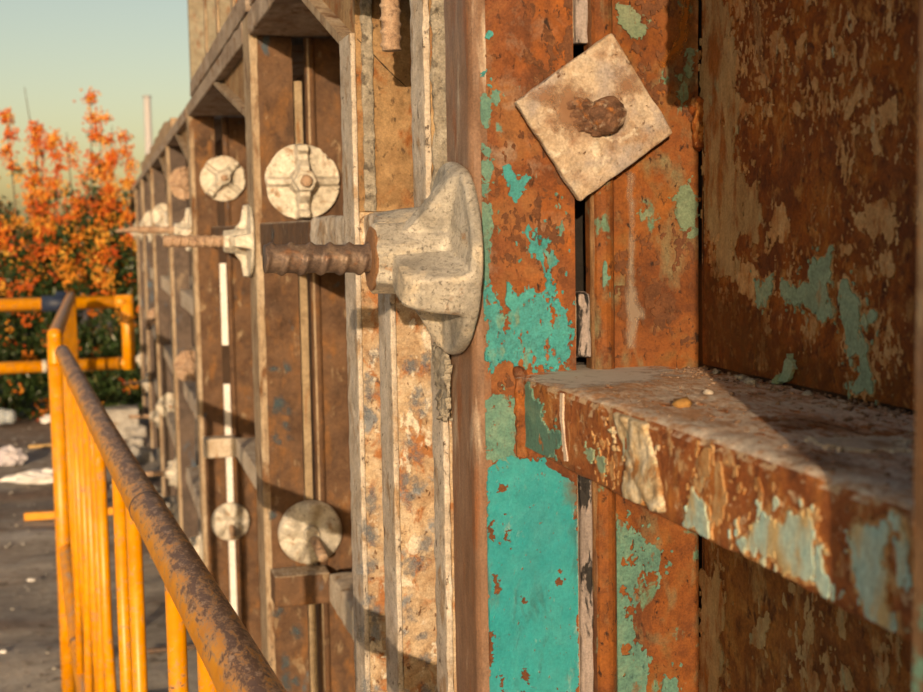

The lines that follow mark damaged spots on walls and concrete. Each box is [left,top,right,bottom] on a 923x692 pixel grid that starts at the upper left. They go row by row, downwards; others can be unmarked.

peeling [480,68,505,129]
rust [518,0,584,131]
rust [616,41,693,122]
rust [486,155,574,274]
peeling [668,0,918,406]
rust [614,213,695,348]
peeling [481,143,579,692]
peeling [583,425,619,490]
rust [492,574,502,595]
rust [489,631,505,692]
peeling [616,510,673,692]
peeling [682,440,914,692]